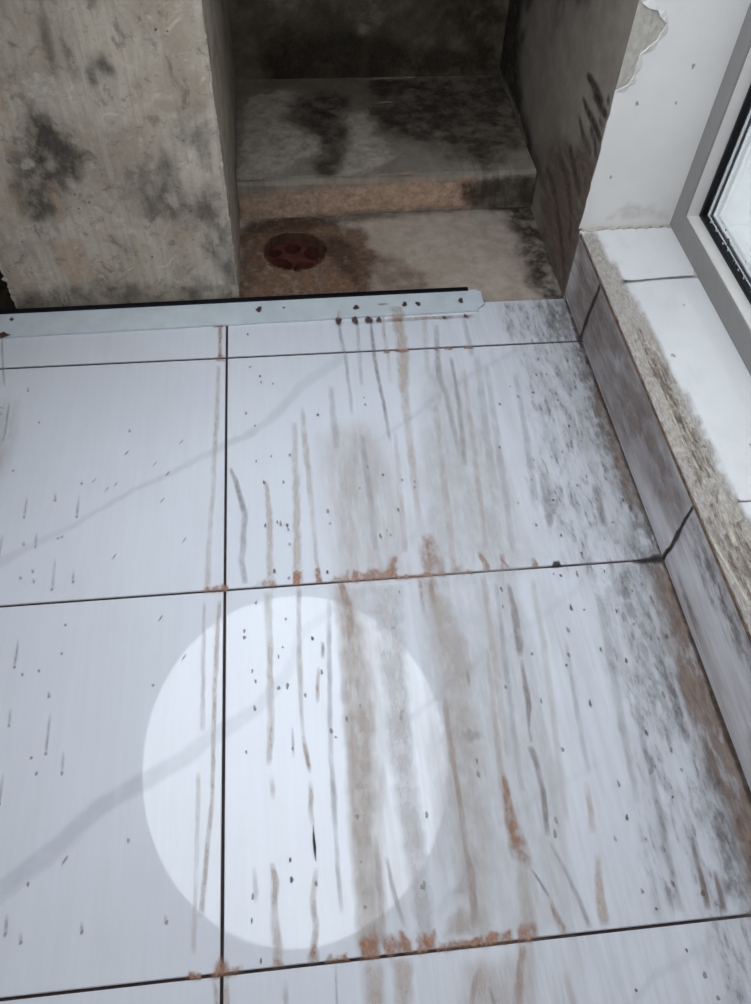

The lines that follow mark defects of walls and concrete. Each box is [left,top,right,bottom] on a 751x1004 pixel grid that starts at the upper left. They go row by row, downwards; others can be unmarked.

peeling [616,0,669,93]
leakage [16,119,78,220]
leakage [238,0,751,881]
corrosion [340,540,444,605]
leakage [695,867,723,907]
corrosion [189,959,238,979]
corrosion [360,925,536,959]